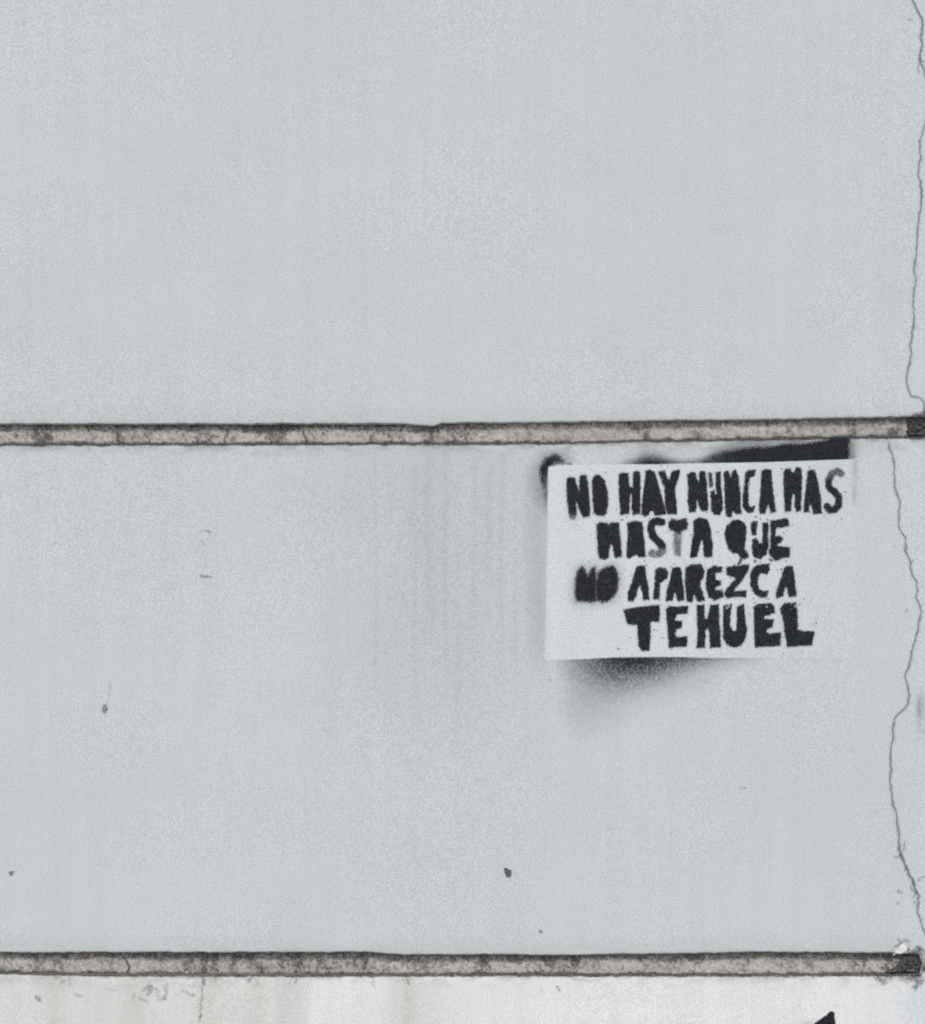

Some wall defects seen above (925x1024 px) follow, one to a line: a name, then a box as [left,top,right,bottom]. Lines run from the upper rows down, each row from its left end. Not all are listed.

crack [894,807,920,915]